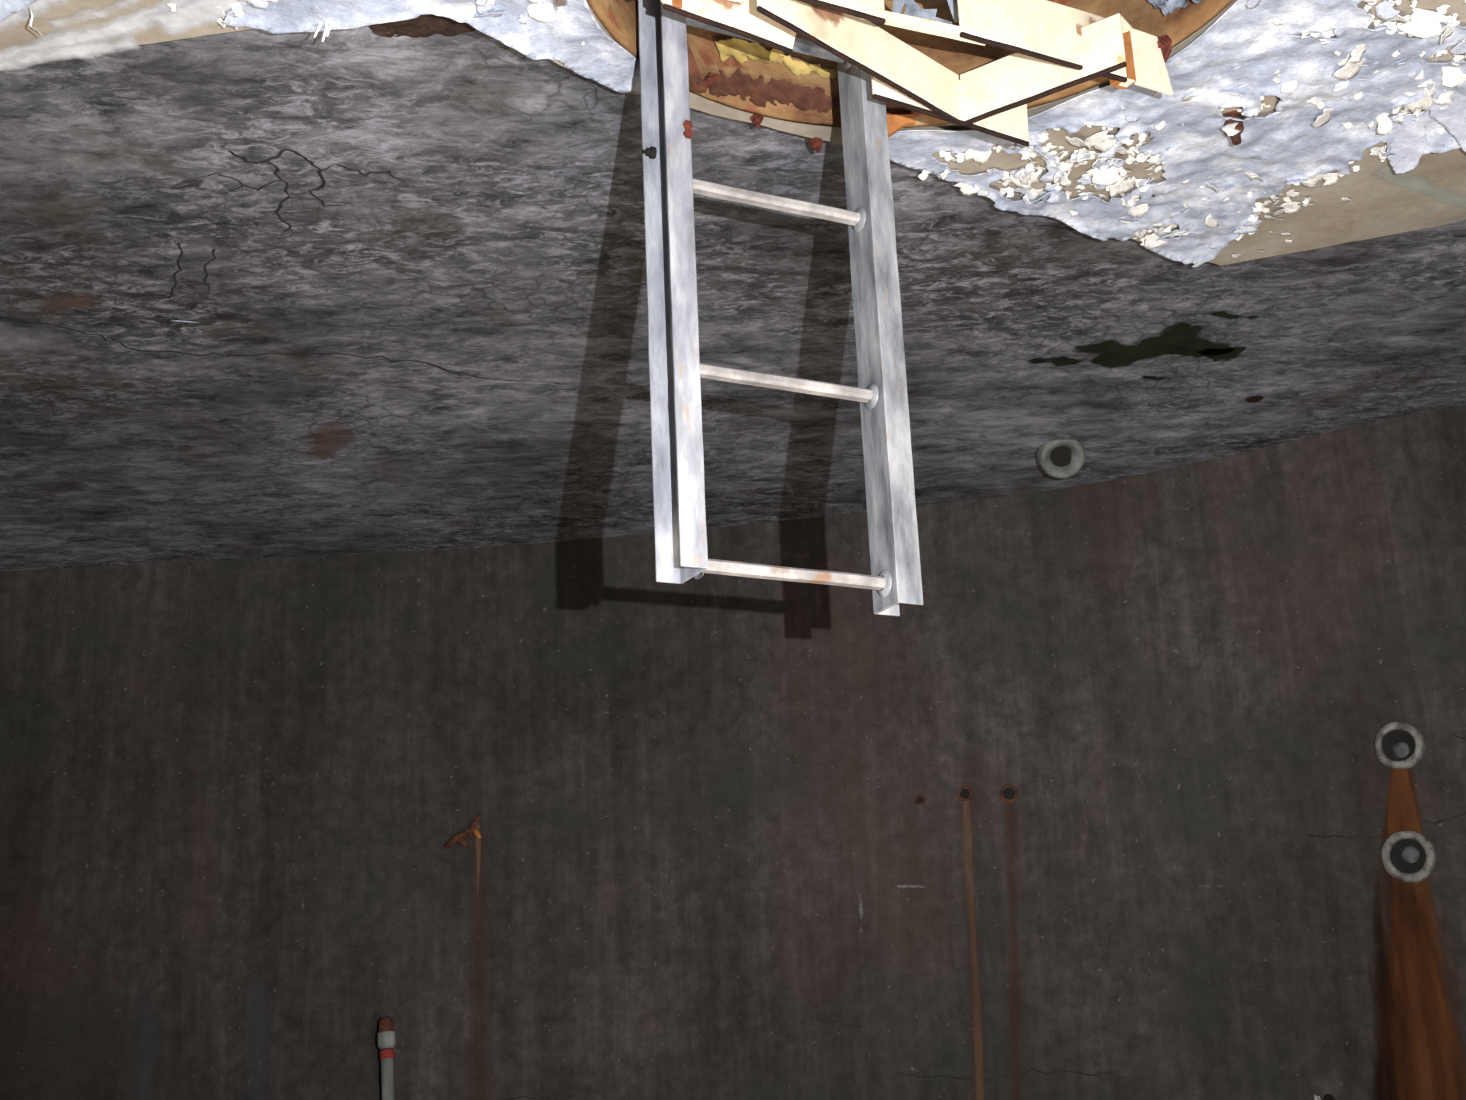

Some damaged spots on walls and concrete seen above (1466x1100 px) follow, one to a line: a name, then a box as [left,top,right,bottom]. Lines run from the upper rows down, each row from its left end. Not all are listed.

peeling [0,0,43,37]
peeling [215,0,641,93]
rust [714,0,742,9]
rust [811,5,843,23]
rust [705,68,840,113]
peeling [888,0,1466,267]
crack [196,149,408,239]
crack [169,242,216,302]
damp [1029,311,1258,380]
rust [1384,768,1422,840]
rust [963,801,984,1100]
rust [1375,875,1465,1100]